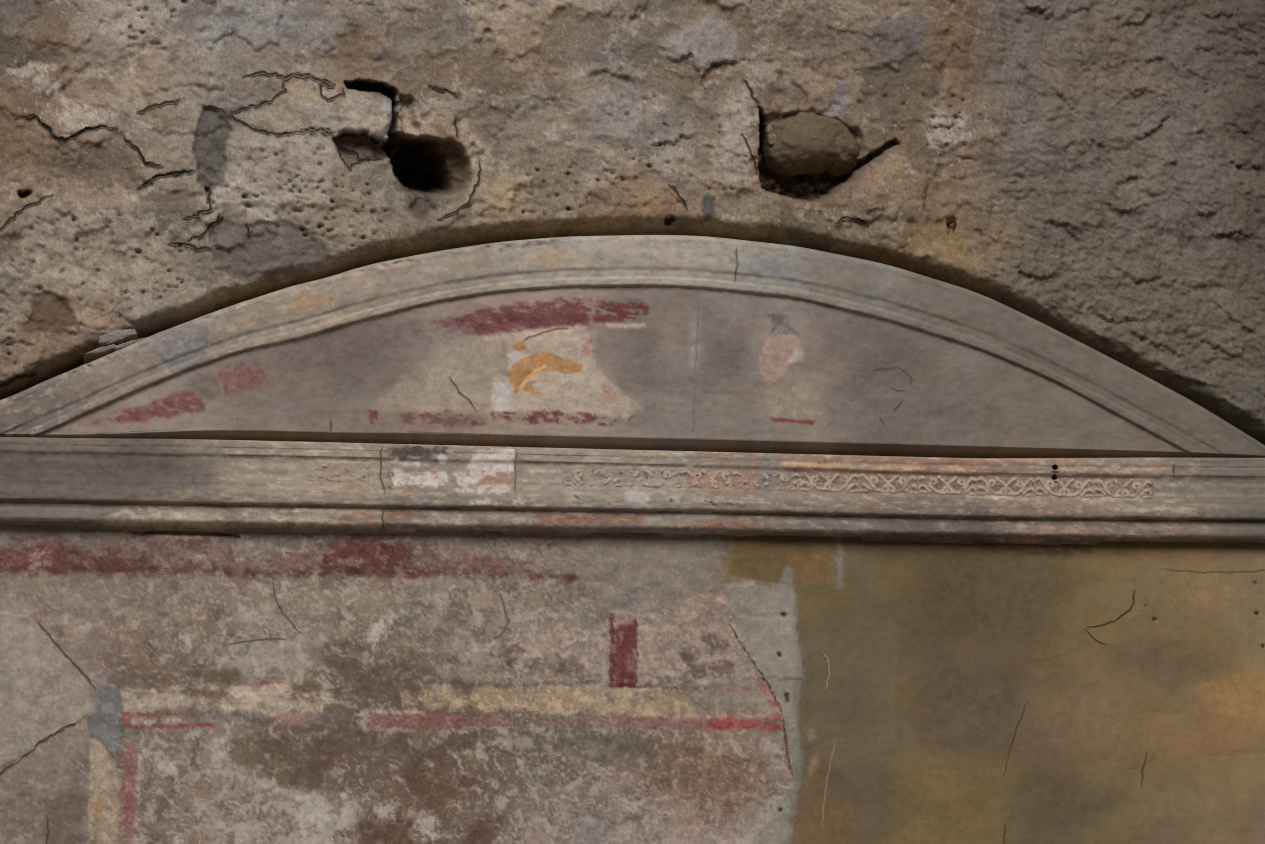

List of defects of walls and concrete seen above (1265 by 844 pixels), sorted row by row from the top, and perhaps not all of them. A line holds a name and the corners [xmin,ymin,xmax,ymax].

spalling [701,37,831,203]
crack [0,194,53,231]
crack [14,70,459,251]
crack [437,161,482,220]
peeling [0,447,568,595]
crack [1160,567,1265,575]
crack [1085,589,1157,646]
crack [35,619,97,690]
crack [729,623,793,777]
crack [0,723,76,776]
crack [821,740,836,829]
crack [43,815,51,844]